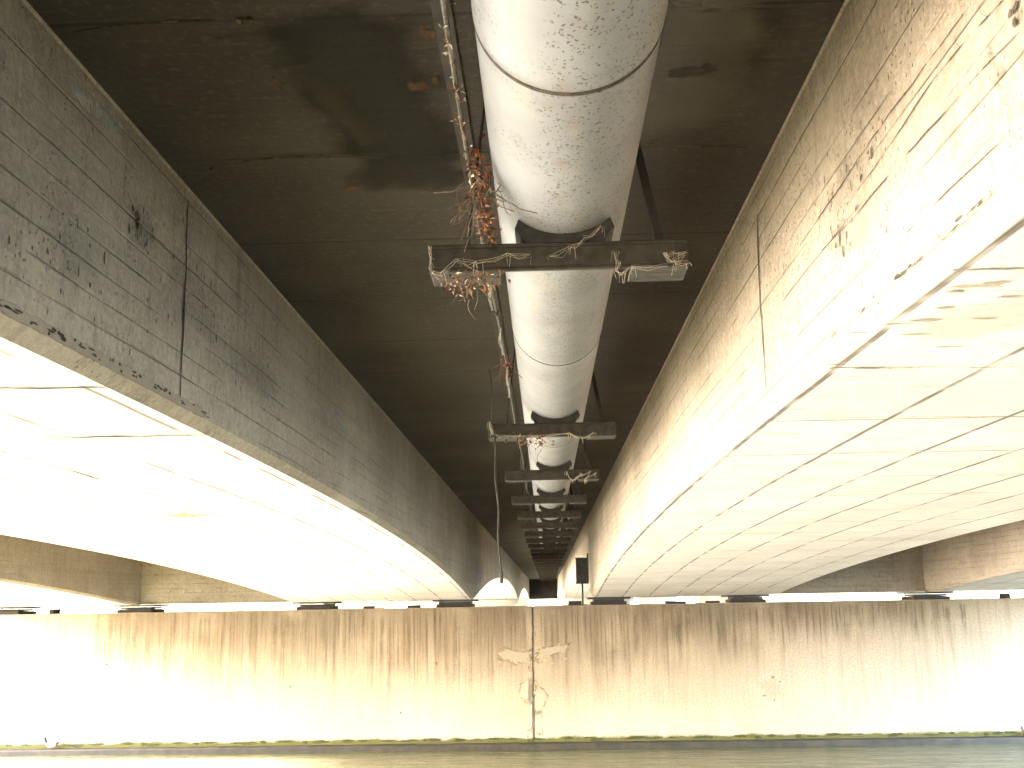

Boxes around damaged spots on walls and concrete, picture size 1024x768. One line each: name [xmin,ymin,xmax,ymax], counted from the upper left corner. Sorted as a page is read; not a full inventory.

damp [271,11,464,187]
spalling [0,299,209,418]
crack [179,167,213,396]
crack [757,217,766,387]
peeling [498,643,571,737]